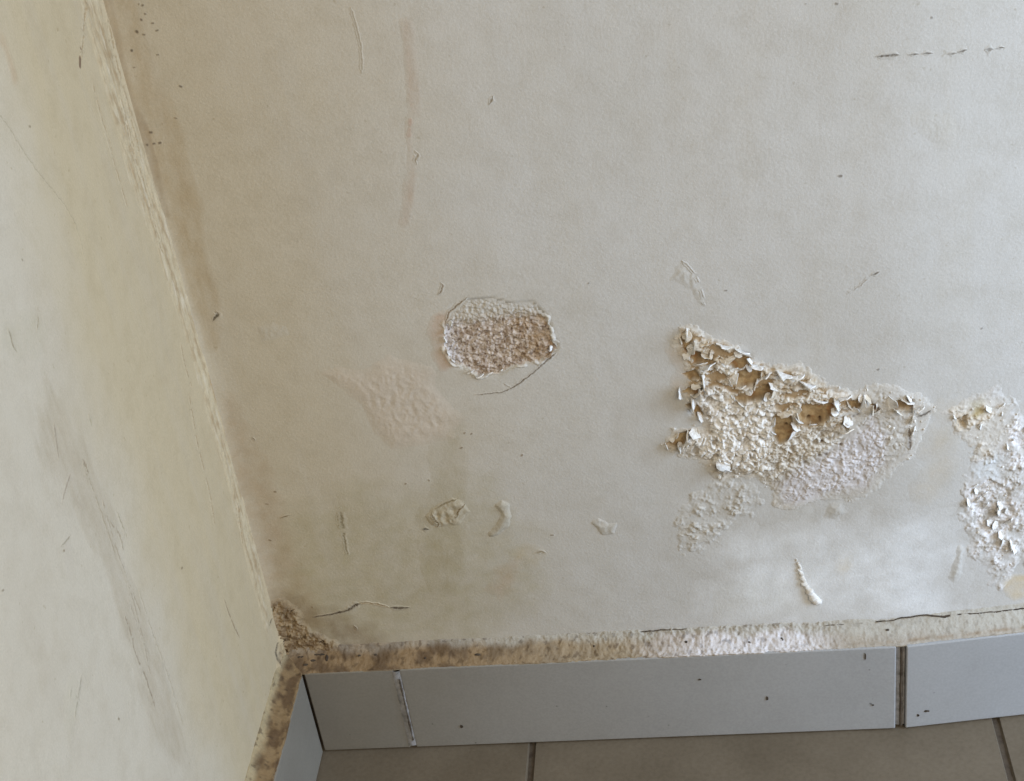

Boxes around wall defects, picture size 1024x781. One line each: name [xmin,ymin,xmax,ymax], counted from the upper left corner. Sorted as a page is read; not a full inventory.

flaking render [439,298,560,380]
crack [475,352,557,395]
flaking render [661,324,1024,591]
peeling [422,497,471,533]
crack [312,600,411,630]